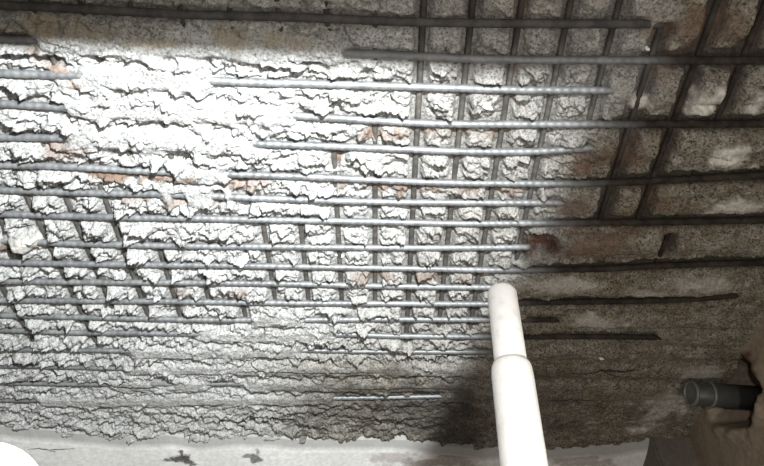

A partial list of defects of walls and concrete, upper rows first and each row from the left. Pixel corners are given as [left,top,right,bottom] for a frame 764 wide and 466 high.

spalling [0,0,764,270]
spalling [0,259,764,450]
leakage [376,391,473,432]